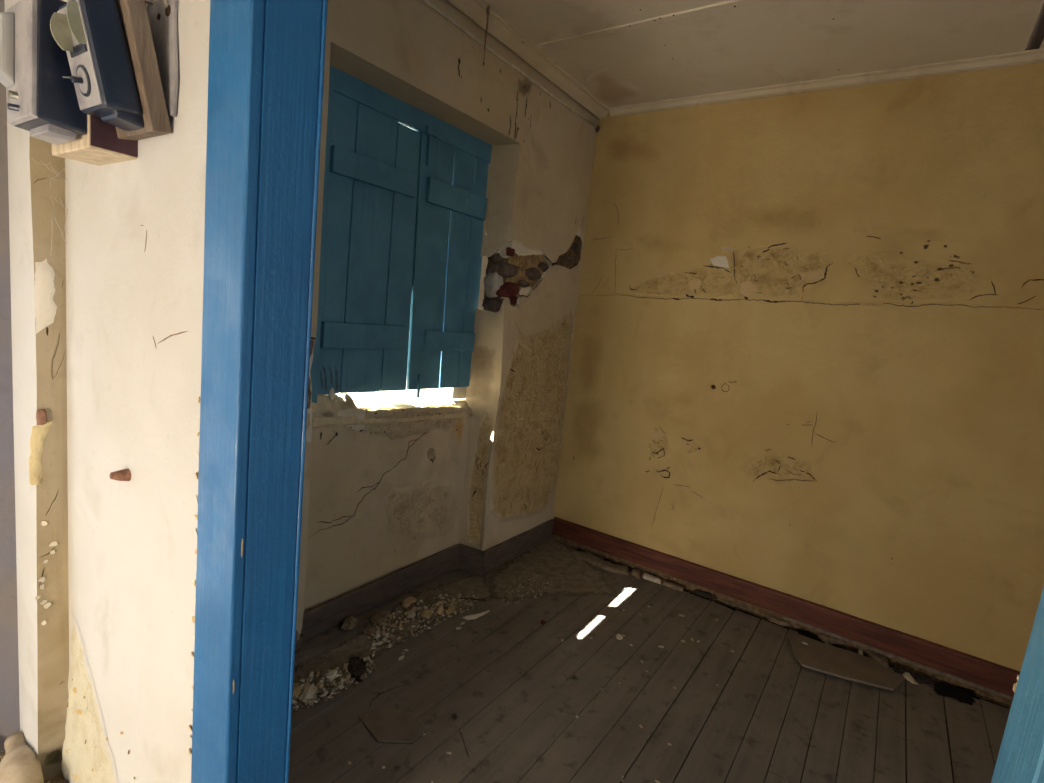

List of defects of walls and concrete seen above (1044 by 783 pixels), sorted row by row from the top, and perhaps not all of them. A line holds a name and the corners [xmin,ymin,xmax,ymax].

peeling [35,258,57,336]
spalling [482,218,584,313]
crack [579,279,1044,310]
peeling [306,337,463,443]
crack [308,426,435,541]